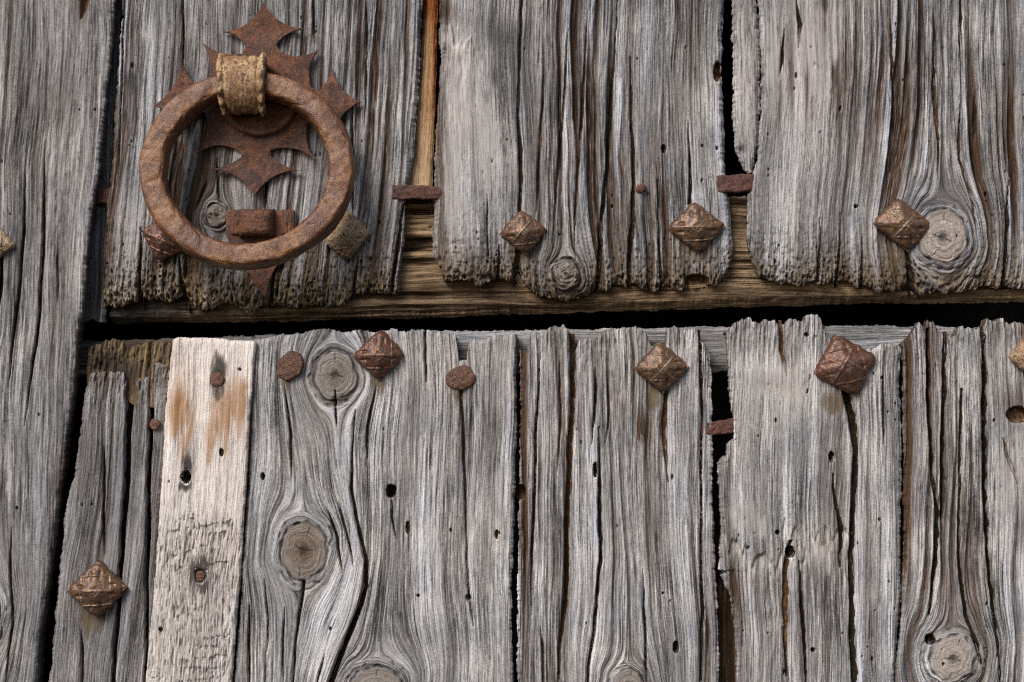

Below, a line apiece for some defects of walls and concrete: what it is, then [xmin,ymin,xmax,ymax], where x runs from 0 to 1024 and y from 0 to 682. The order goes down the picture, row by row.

crack [832,391,858,682]